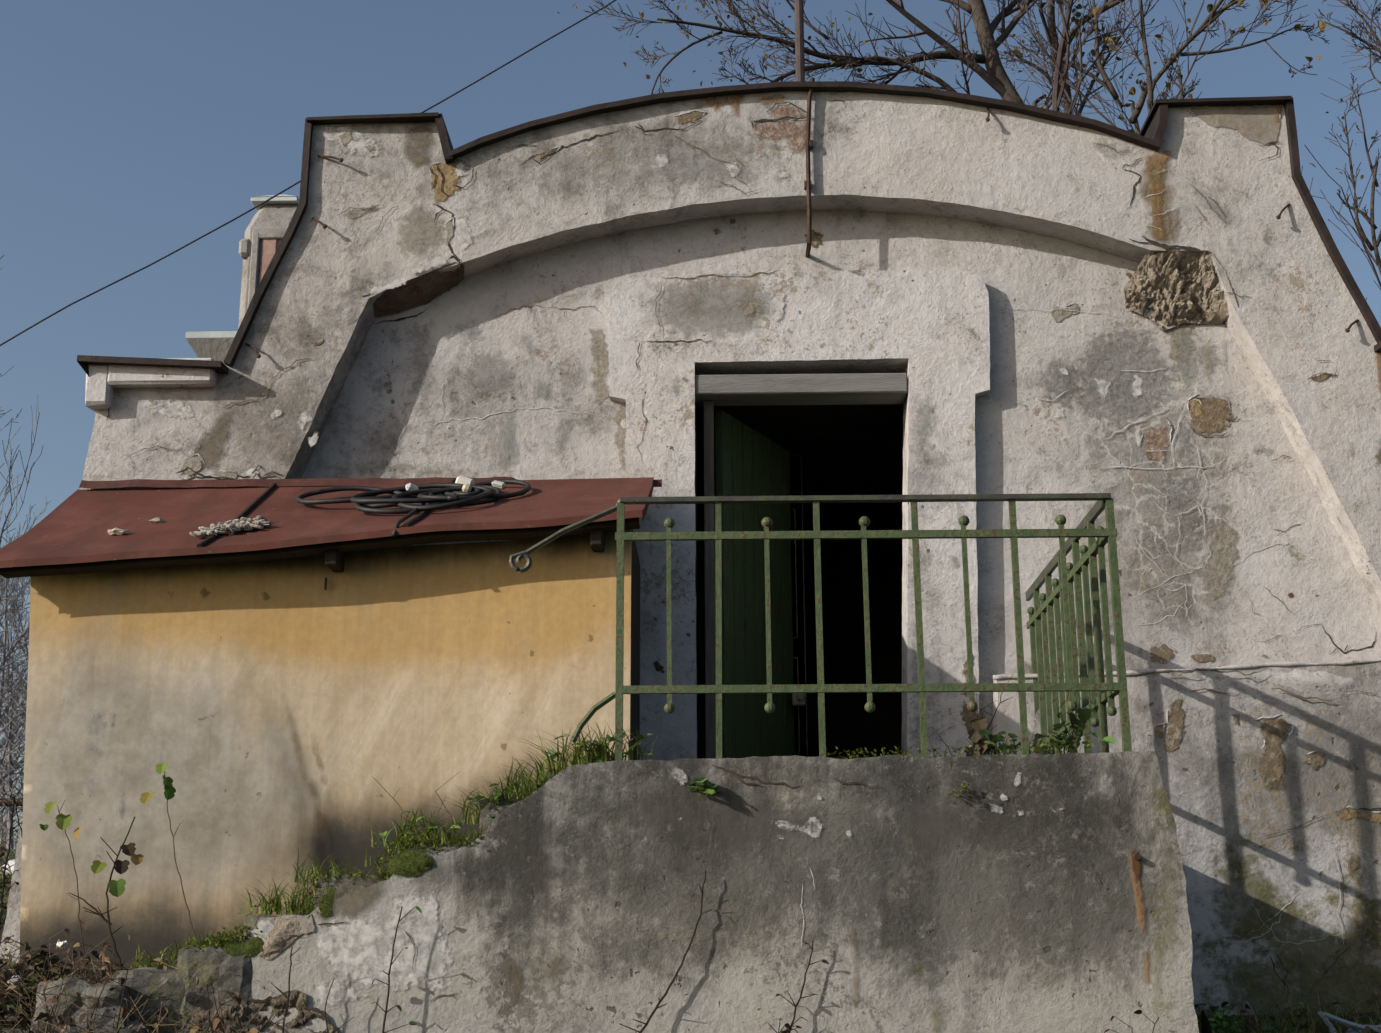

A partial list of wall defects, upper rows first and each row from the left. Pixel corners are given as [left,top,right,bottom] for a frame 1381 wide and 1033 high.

spalling [751,101,816,152]
spalling [430,157,475,203]
peeling [654,135,789,194]
spalling [362,255,464,324]
spalling [994,236,1248,600]
peeling [1257,715,1295,789]
spalling [1263,806,1381,837]
peeling [188,883,453,1033]